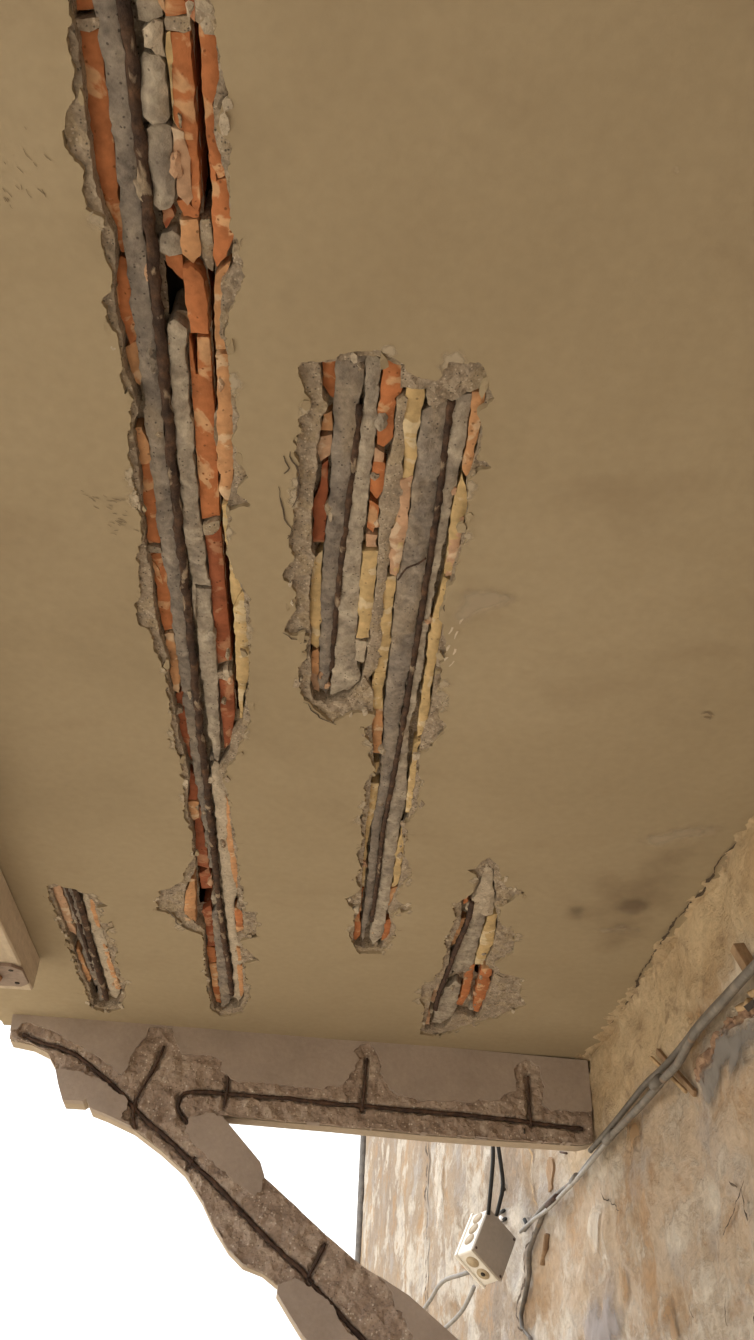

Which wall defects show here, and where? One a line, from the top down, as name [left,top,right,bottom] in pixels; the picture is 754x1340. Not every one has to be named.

spalling [115,0,248,996]
spalling [329,403,363,672]
spalling [348,399,456,923]
spalling [56,888,124,1013]
spalling [422,899,475,1025]
flaking render [693,989,754,1083]
spalling [9,1023,594,1340]